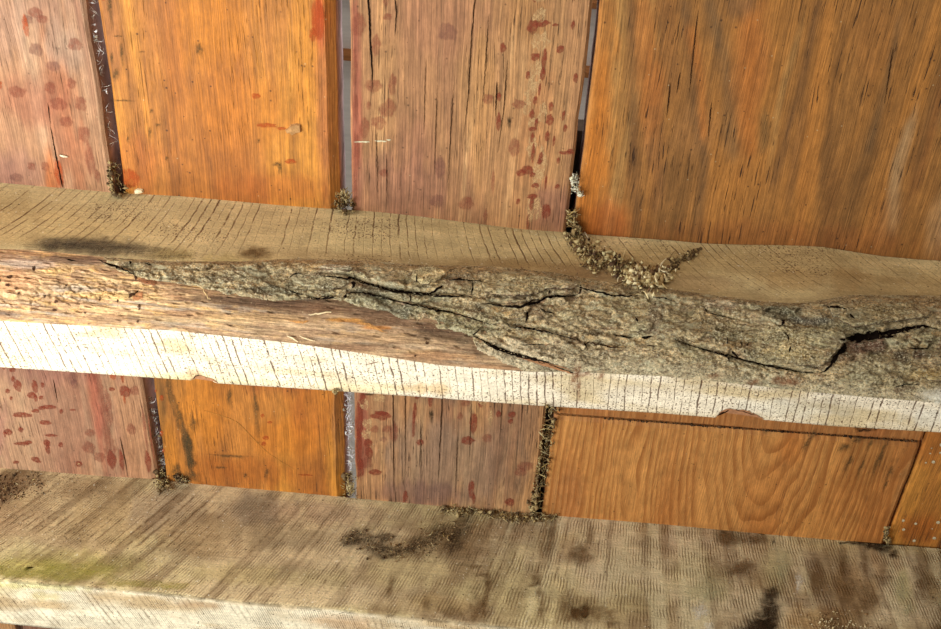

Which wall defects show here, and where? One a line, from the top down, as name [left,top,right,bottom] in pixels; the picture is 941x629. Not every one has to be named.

crack [290,273,937,374]
water stain [343,519,469,557]
water stain [740,588,778,629]